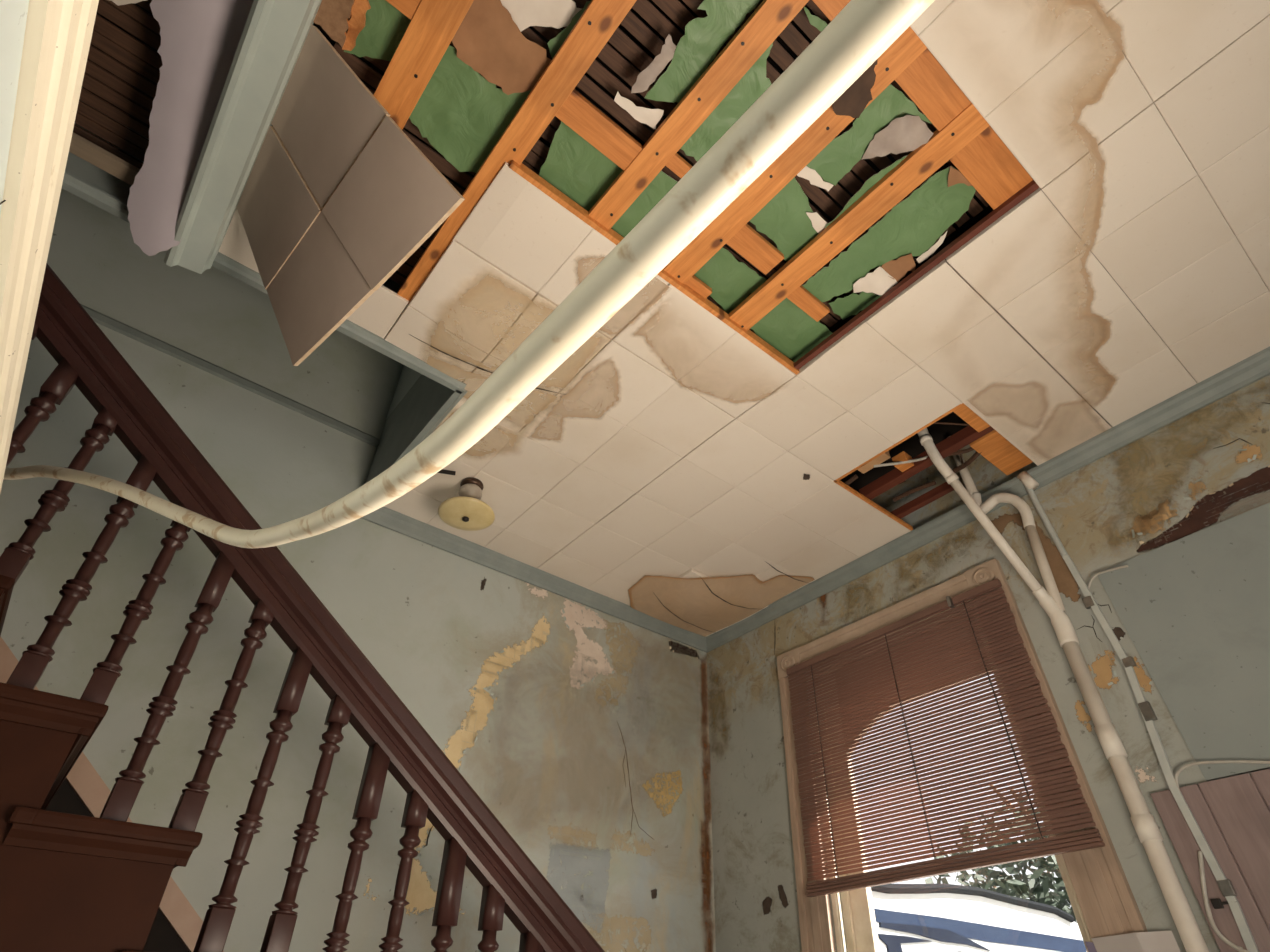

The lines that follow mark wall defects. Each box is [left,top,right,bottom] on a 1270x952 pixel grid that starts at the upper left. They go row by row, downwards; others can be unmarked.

damp [1054,0,1124,391]
spalling [1128,444,1270,553]
peeling [525,583,548,600]
peeling [442,598,616,771]
peeling [1088,627,1125,690]
peeling [1133,657,1154,694]
peeling [399,818,437,916]
peeling [588,912,651,952]